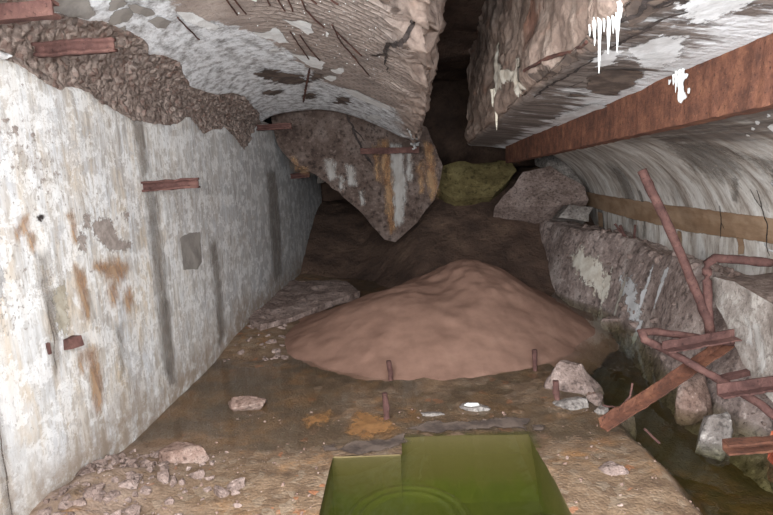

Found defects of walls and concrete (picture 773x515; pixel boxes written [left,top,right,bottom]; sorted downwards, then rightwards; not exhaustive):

spalling [0,0,261,150]
water stain [177,12,219,31]
crack [369,20,415,72]
spalling [523,30,604,83]
spalling [565,68,644,97]
water stain [592,34,691,68]
spalling [625,0,666,35]
water stain [668,71,690,103]
water stain [267,173,281,279]
crack [750,189,770,256]
water stain [149,199,175,380]
corrosion [79,350,102,412]